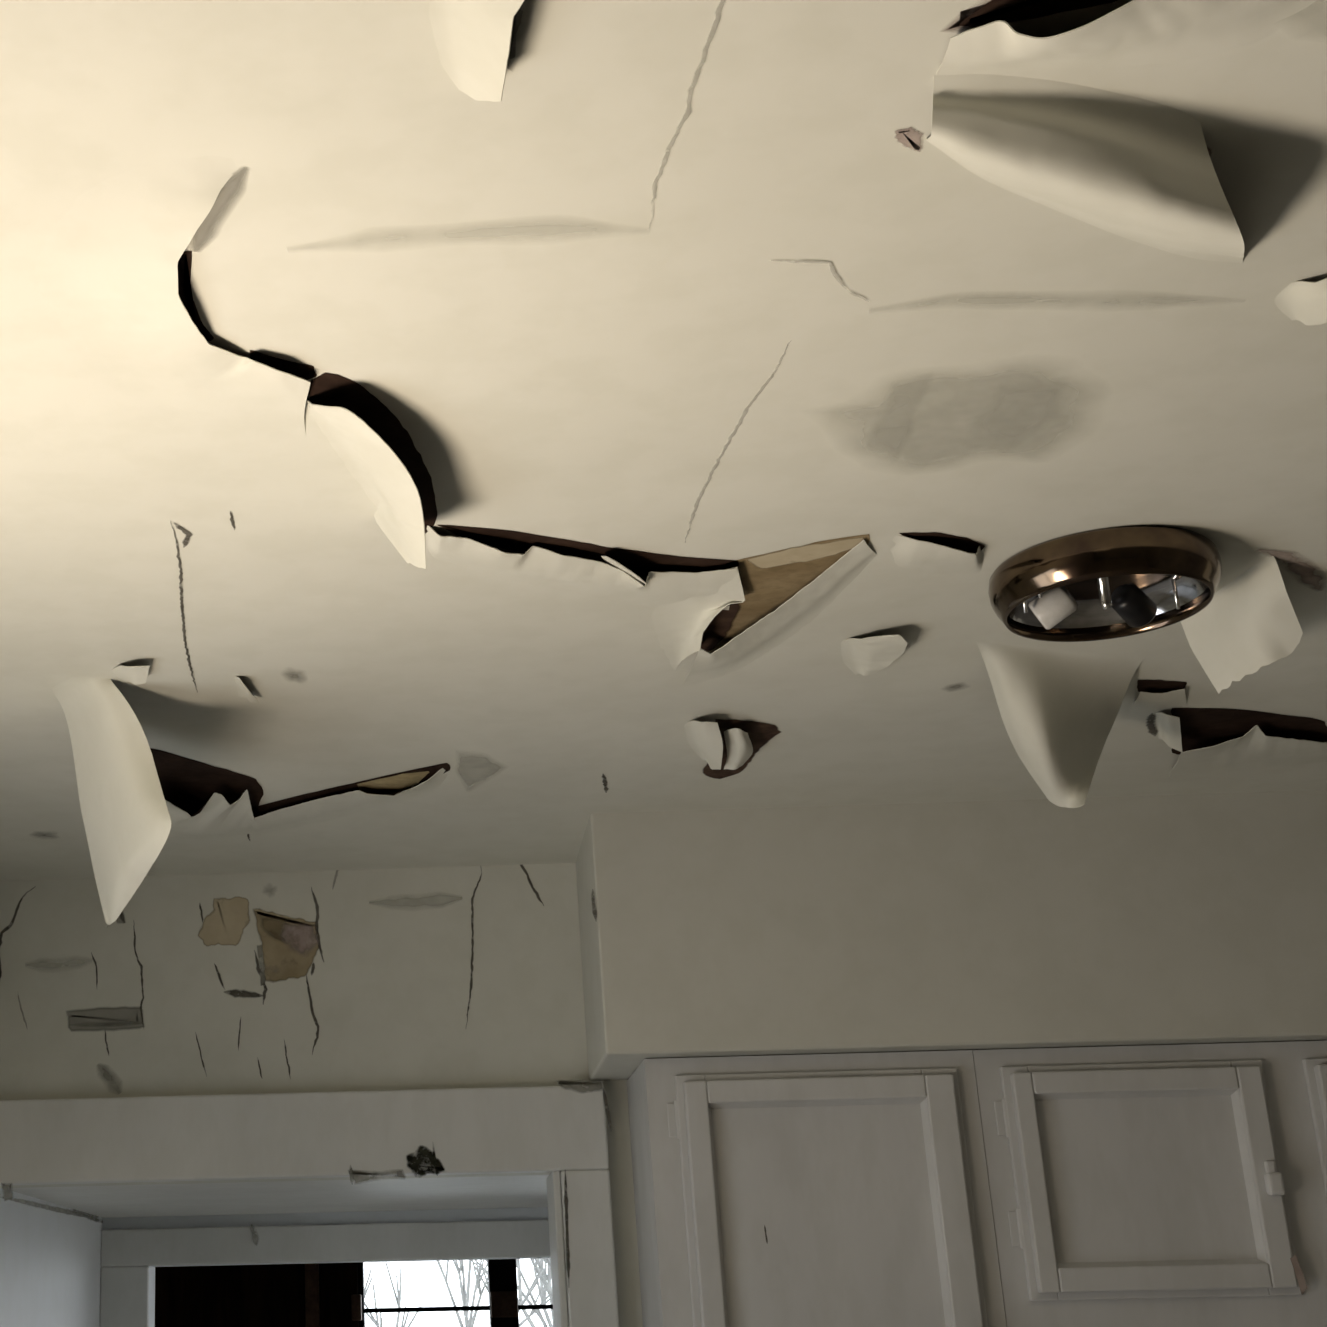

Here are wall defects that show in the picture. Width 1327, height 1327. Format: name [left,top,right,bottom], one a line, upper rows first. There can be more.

peeling [428,0,525,102]
crack [653,0,723,197]
peeling [895,0,1327,264]
peeling [34,155,985,686]
crack [690,348,787,521]
damp [855,373,1068,462]
crack [172,523,198,693]
peeling [51,665,451,928]
peeling [684,719,781,779]
peeling [976,549,1327,808]
crack [214,873,337,1078]
crack [466,874,482,1025]